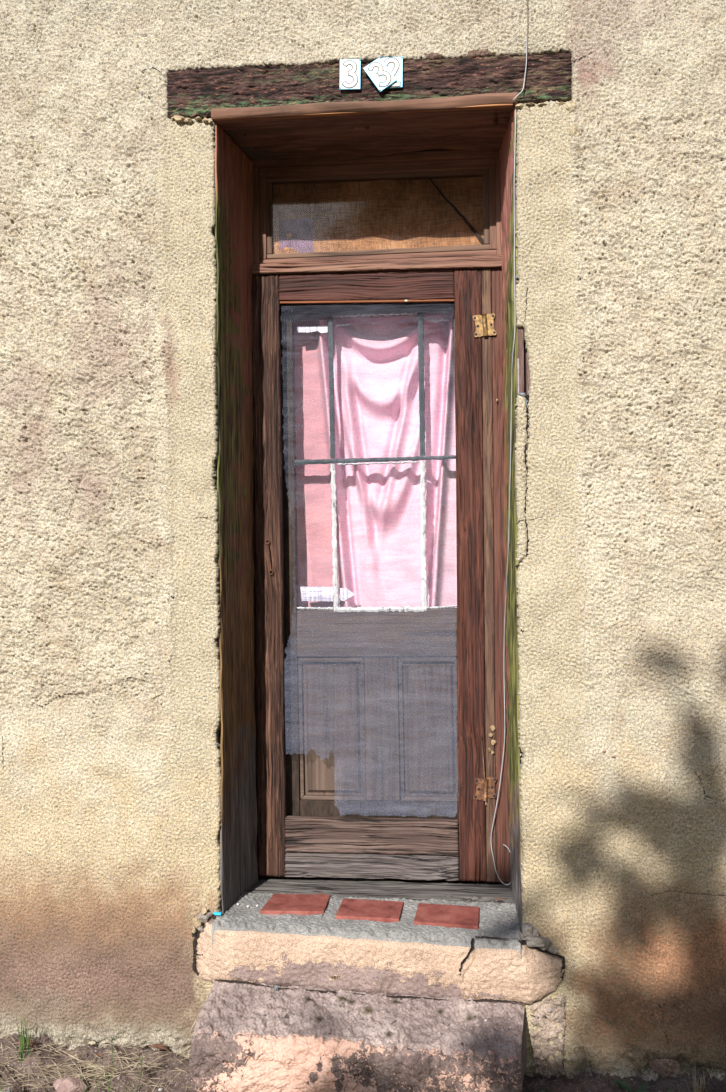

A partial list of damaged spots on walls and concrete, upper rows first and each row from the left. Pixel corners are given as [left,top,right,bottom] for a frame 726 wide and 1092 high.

crack [515,395,543,568]
water stain [0,894,201,1055]
crack [192,924,522,1003]
peeling [191,908,568,1092]
crack [459,936,566,1071]
water stain [575,912,726,1083]